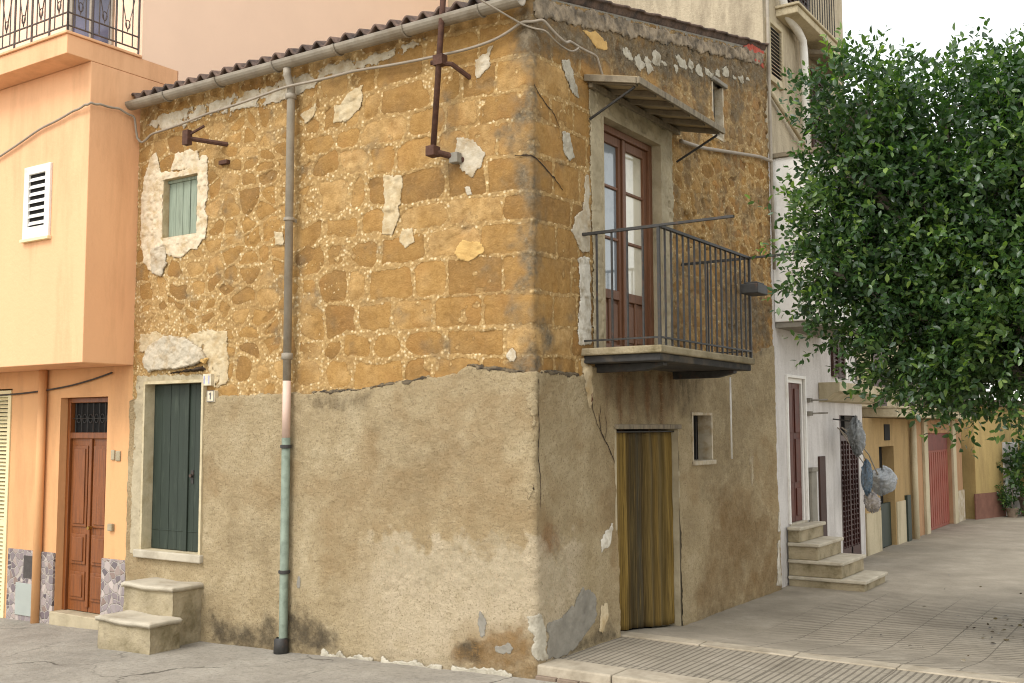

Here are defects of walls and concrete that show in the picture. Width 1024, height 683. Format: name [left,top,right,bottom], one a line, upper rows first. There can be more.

crack [515,154,563,190]
crack [592,402,615,463]
leakage [215,619,275,646]
leakage [288,614,330,648]
spalling [495,643,513,654]
peeling [527,587,609,661]